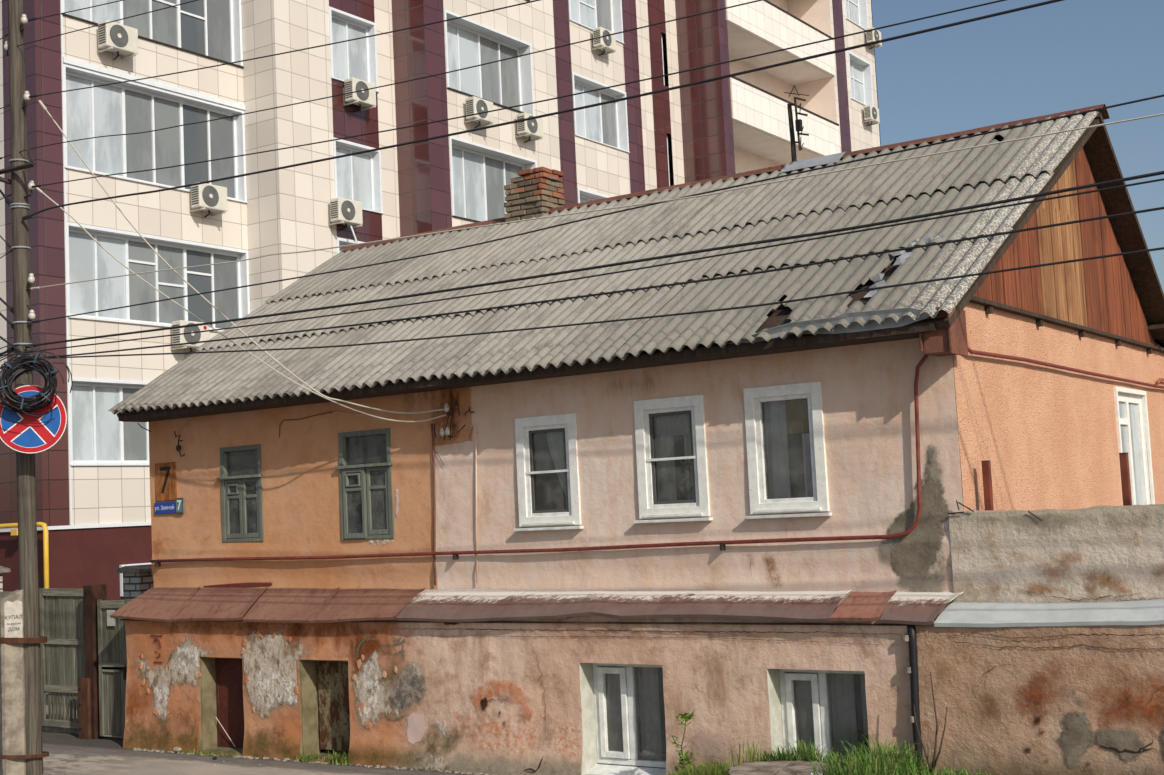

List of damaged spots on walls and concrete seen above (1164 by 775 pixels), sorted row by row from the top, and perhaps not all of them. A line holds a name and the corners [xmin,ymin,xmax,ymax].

crack [1028,591,1164,602]
peeling [137,636,212,721]
peeling [241,630,310,718]
peeling [352,648,425,729]
crack [945,633,1164,689]
crack [1100,740,1157,754]